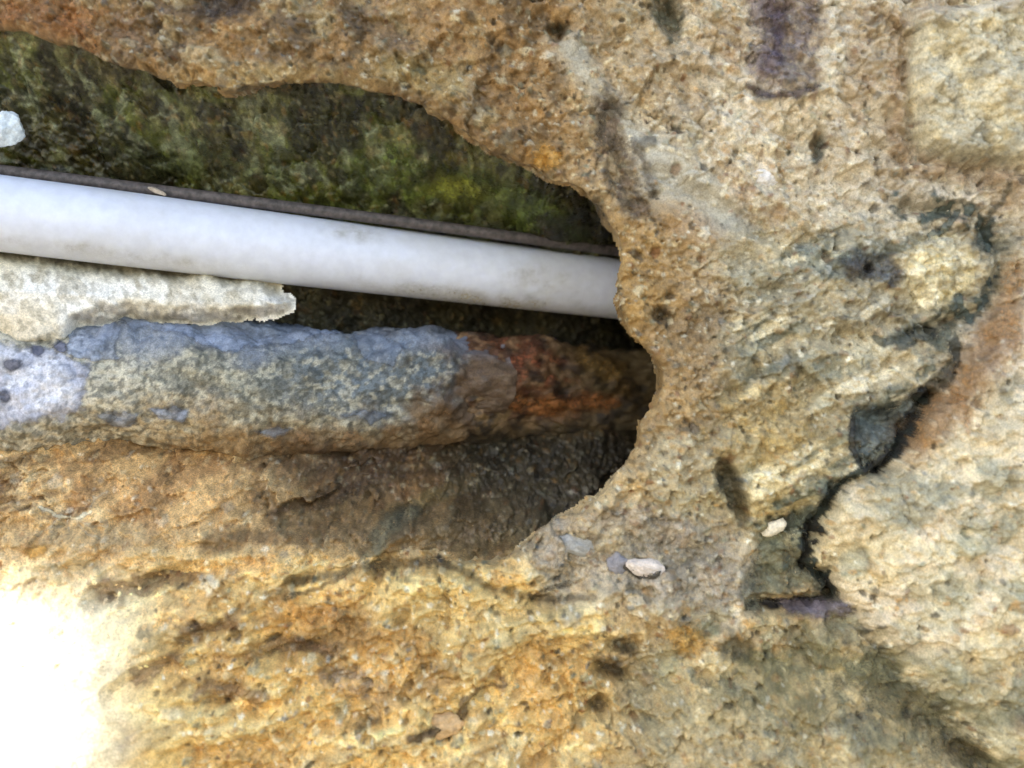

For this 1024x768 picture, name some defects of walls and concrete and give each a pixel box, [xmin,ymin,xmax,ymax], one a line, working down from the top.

spalling [0,31,620,259]
spalling [0,284,643,430]
corrosion [486,336,634,417]
crack [747,182,1011,657]
spalling [0,409,760,677]